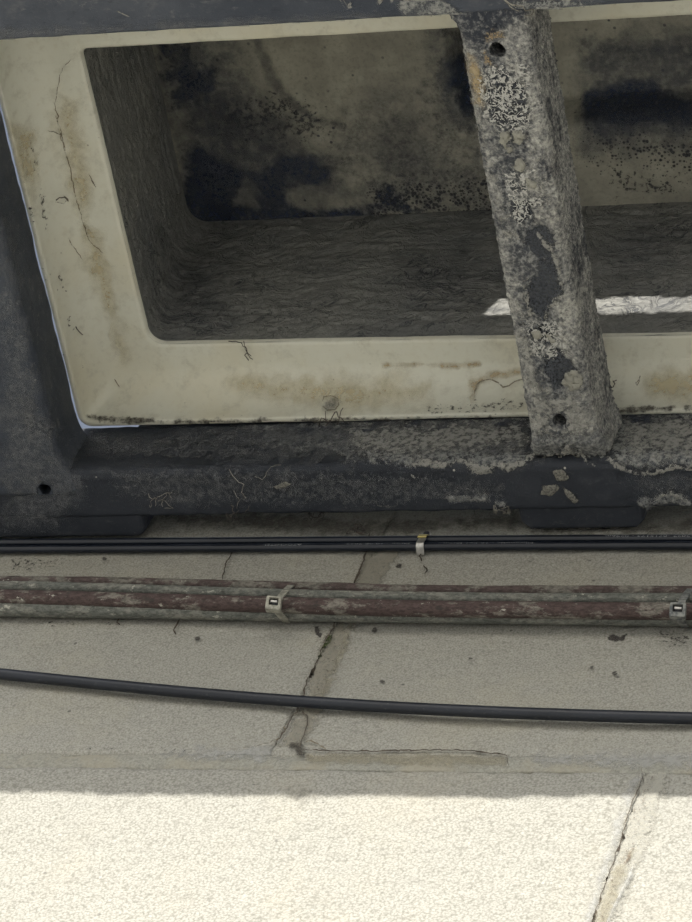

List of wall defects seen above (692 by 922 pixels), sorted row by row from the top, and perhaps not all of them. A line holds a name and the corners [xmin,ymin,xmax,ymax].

damp [159,43,550,242]
mould [575,42,692,201]
damp [328,231,592,461]
peeling [234,414,692,478]
peeling [540,469,579,503]
crack [243,622,509,765]
crack [591,769,643,922]